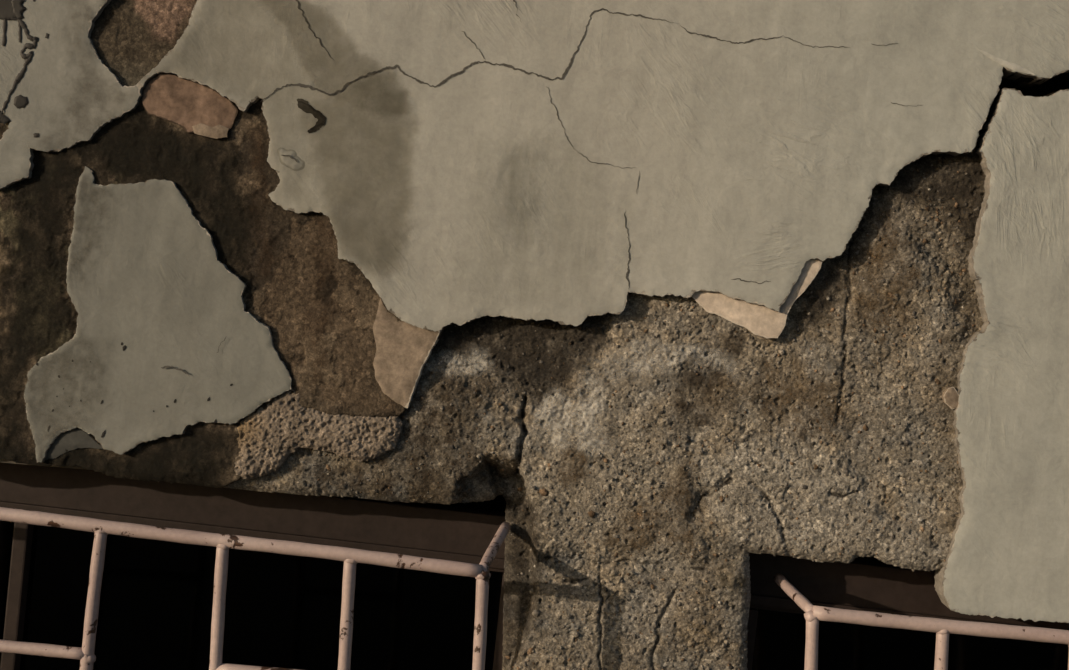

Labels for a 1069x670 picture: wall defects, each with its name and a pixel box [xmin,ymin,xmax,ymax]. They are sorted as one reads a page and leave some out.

peeling [0,186,78,467]
peeling [0,141,160,372]
spalling [90,0,197,87]
spalling [85,73,986,670]
crack [263,0,898,287]
crack [974,47,1069,152]